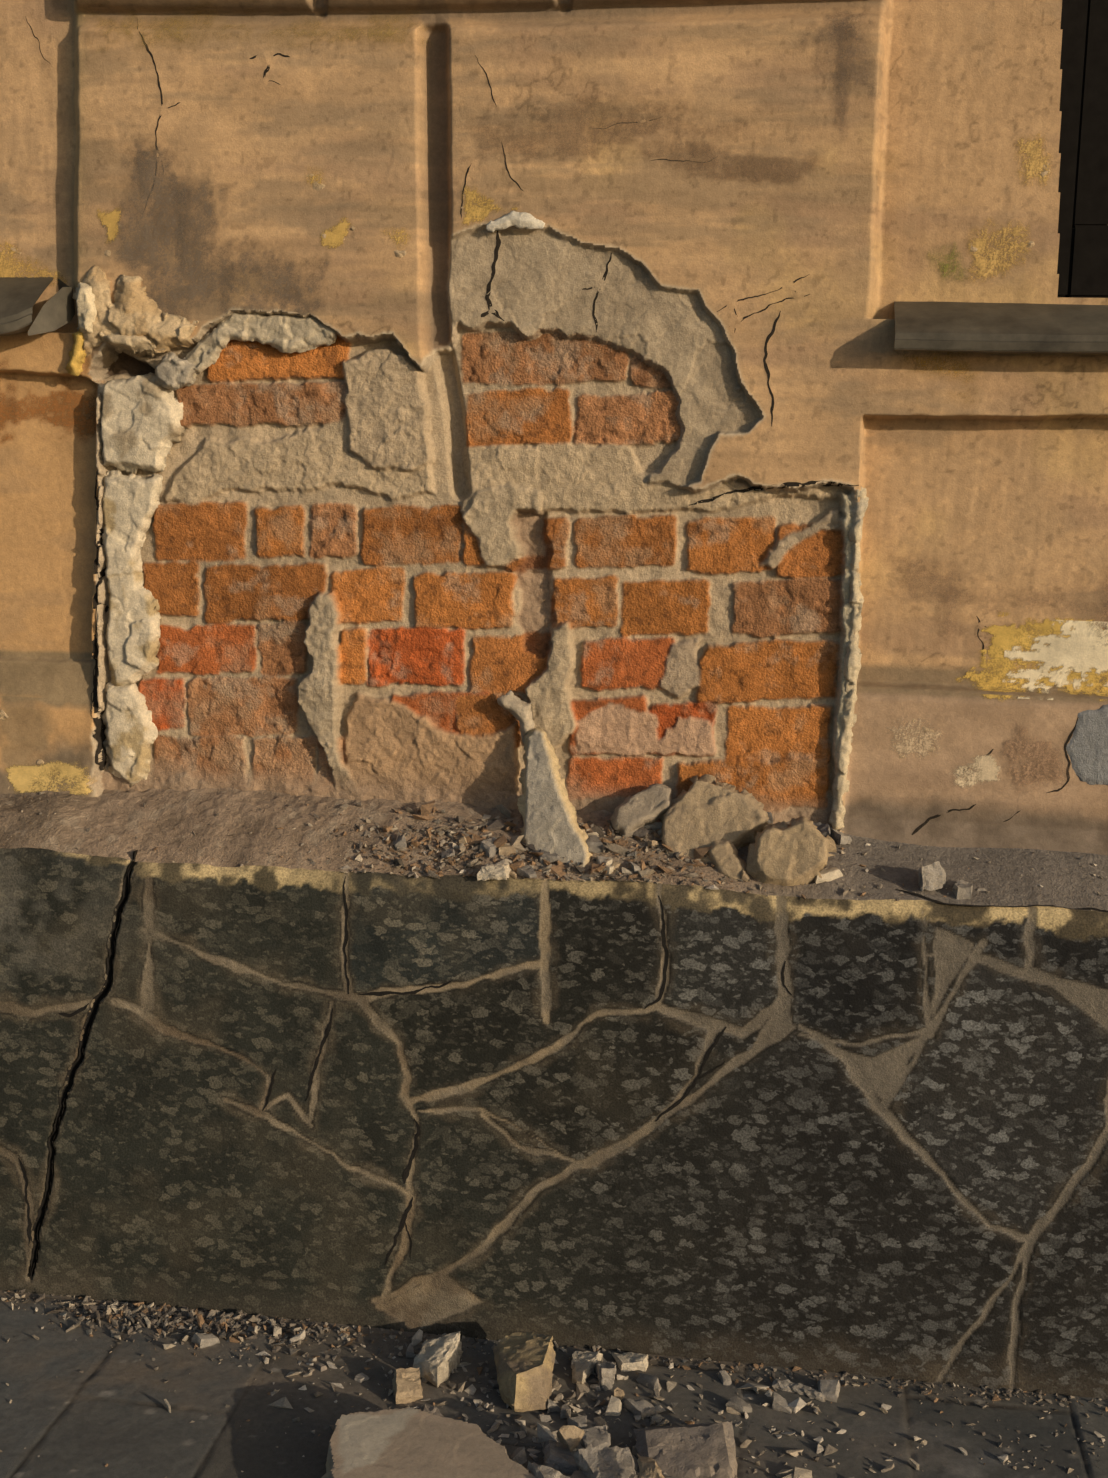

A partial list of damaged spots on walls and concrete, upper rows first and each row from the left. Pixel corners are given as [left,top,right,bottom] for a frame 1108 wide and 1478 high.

flaking render [0,187,869,832]
crack [717,275,810,426]
peeling [957,612,1108,701]
crack [18,850,138,1277]